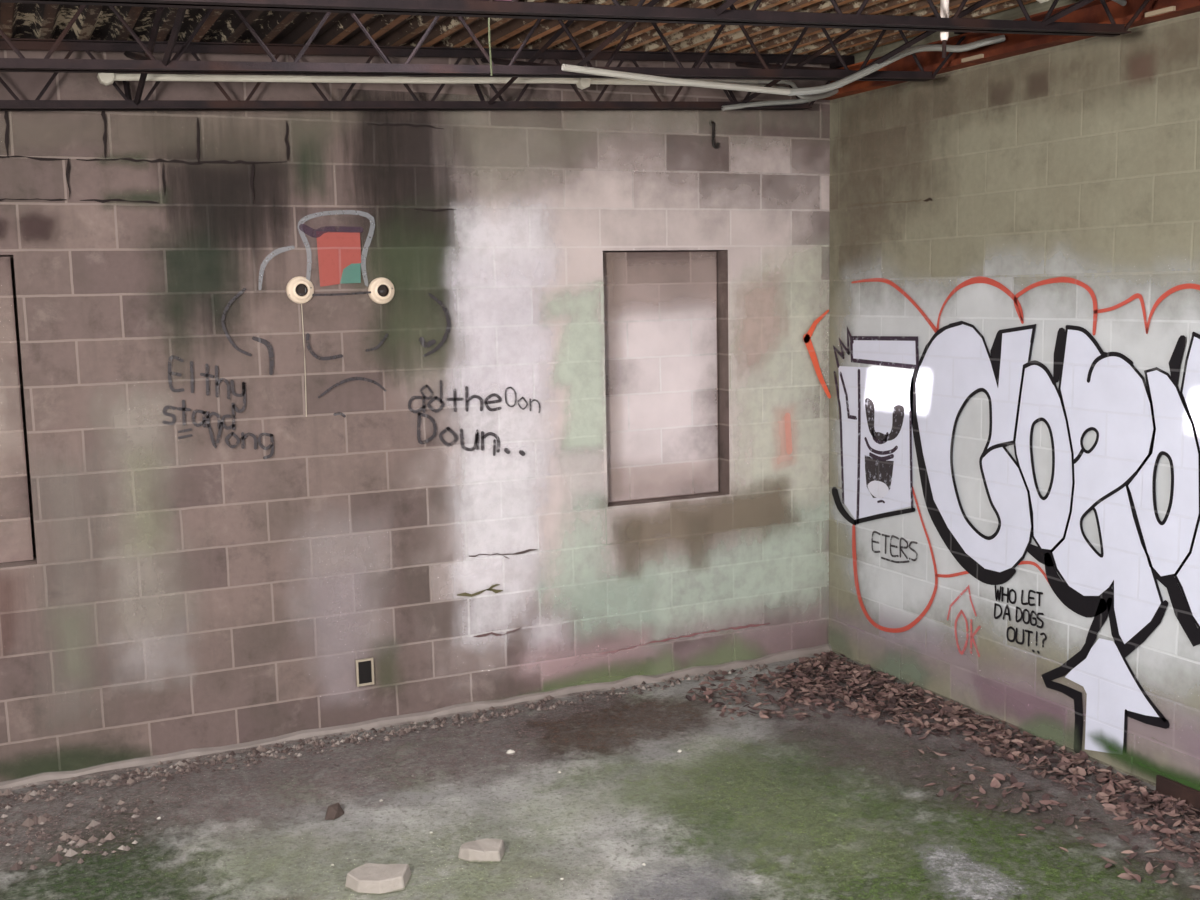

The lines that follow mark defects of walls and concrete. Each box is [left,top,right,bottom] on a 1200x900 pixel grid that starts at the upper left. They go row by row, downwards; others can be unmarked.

leakage [166,128,285,240]
leakage [362,94,450,255]